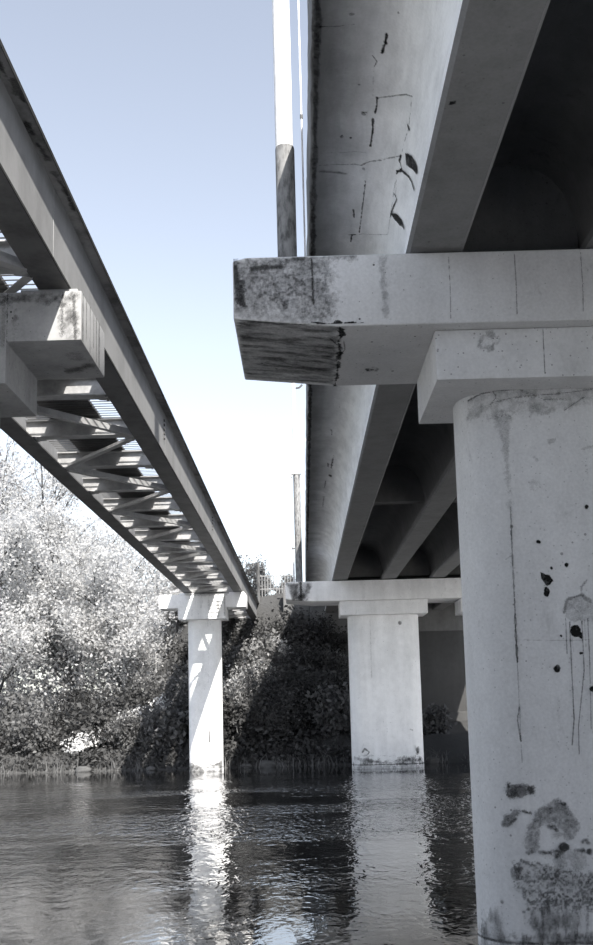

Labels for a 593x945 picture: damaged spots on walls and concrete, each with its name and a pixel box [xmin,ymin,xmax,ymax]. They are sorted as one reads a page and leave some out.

crack [320,94,410,242]
leakage [563,594,591,754]
leakage [477,905,593,945]